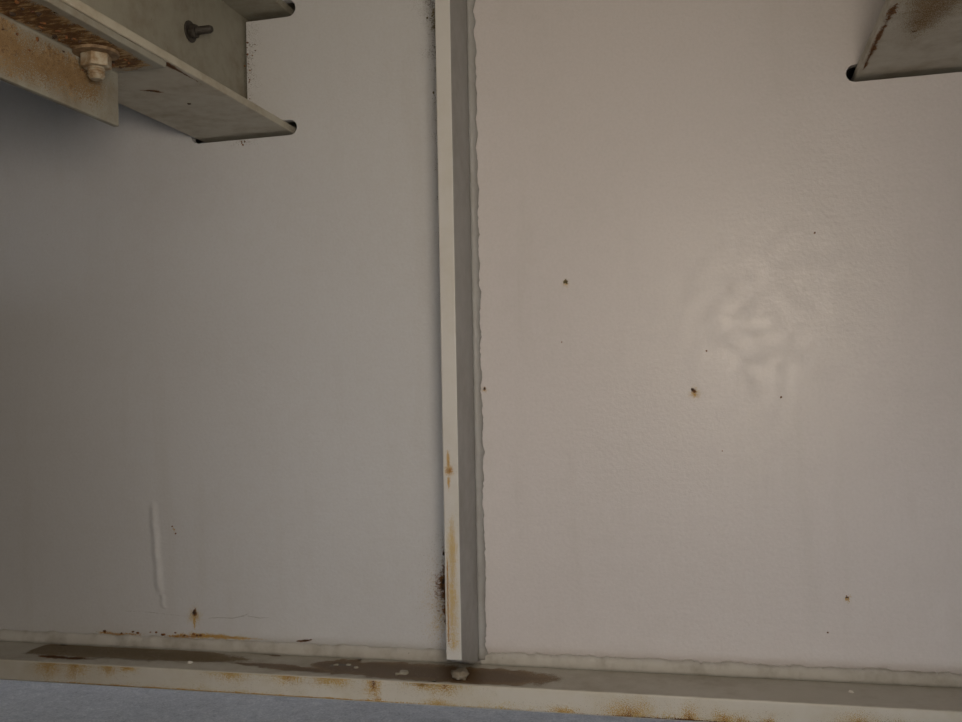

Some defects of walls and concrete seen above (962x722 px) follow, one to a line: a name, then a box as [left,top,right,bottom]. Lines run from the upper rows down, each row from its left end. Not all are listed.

rust [0,0,152,115]
leakage [412,0,437,108]
rust [864,0,962,69]
rust [96,605,263,641]
rust [417,518,460,653]
rust [33,663,783,722]